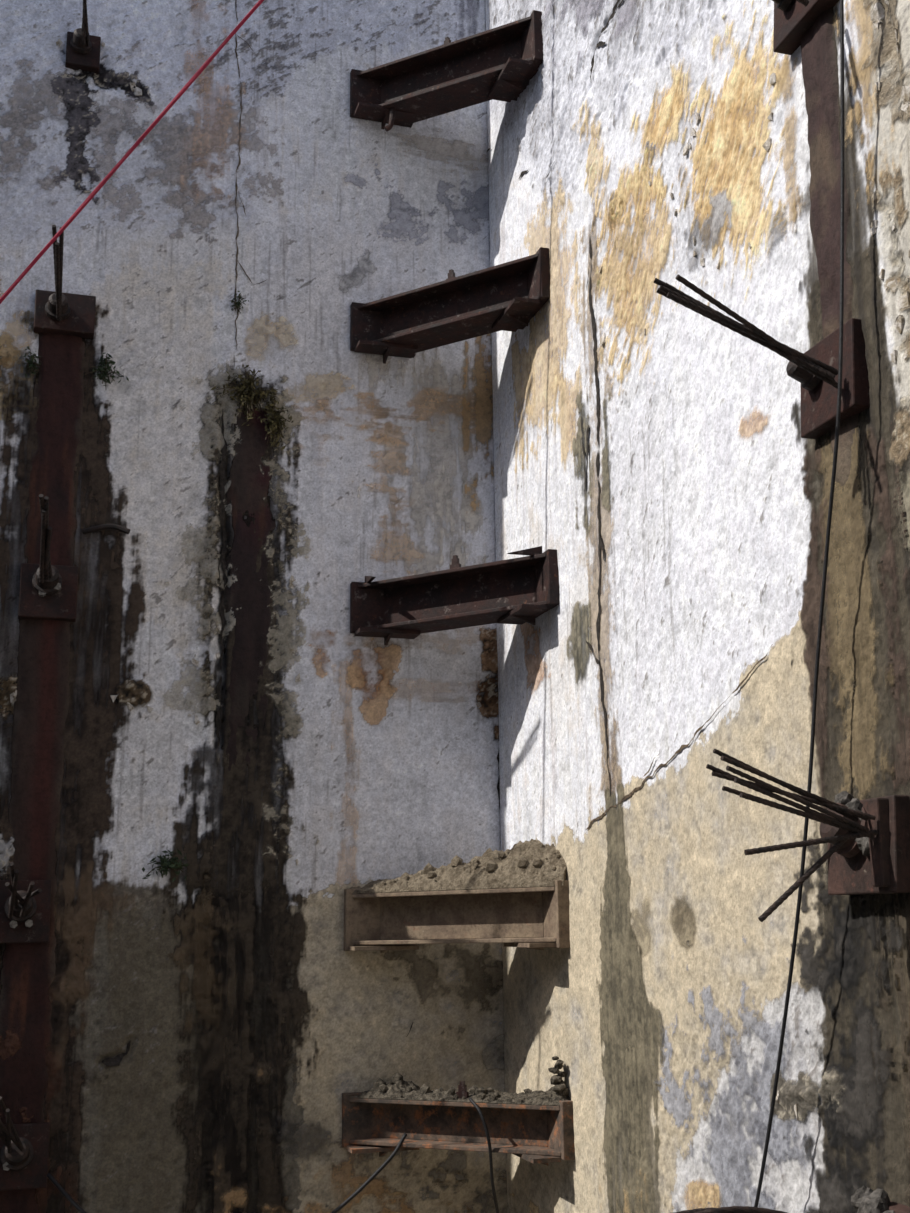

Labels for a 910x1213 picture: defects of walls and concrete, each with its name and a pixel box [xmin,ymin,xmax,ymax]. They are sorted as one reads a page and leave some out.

water stain [155,366,320,1213]
spalling [476,628,499,740]
water stain [566,601,591,683]
water stain [572,391,613,535]
crack [581,234,773,830]
peeling [572,1,788,394]
corrosion [801,443,830,814]
water stain [791,7,910,809]
peeling [862,0,910,124]
corrosion [865,431,910,787]
peeling [870,166,910,364]
water stain [596,783,910,1213]